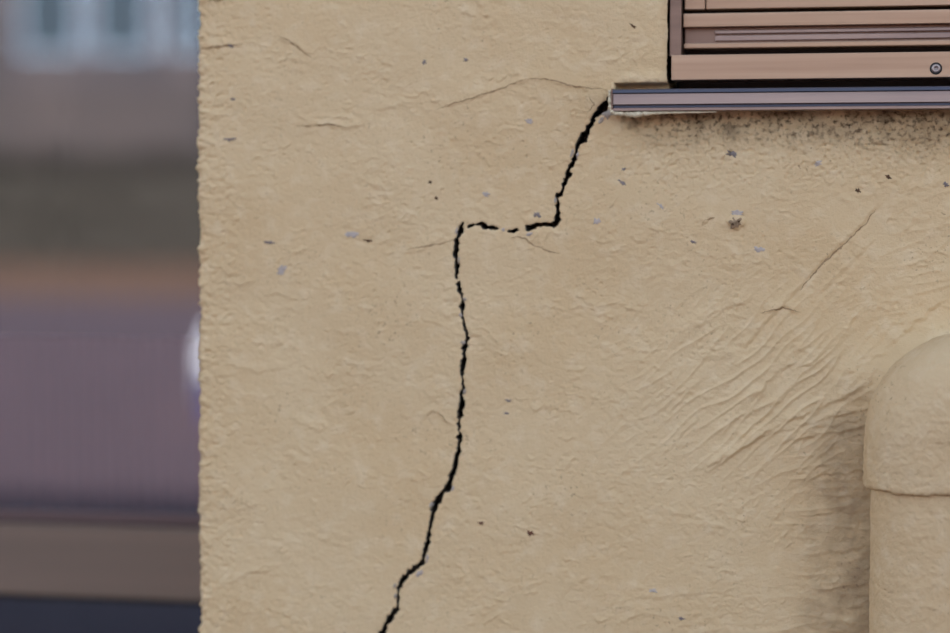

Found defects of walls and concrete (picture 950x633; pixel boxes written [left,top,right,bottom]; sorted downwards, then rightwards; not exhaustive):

crack [378,78,613,633]